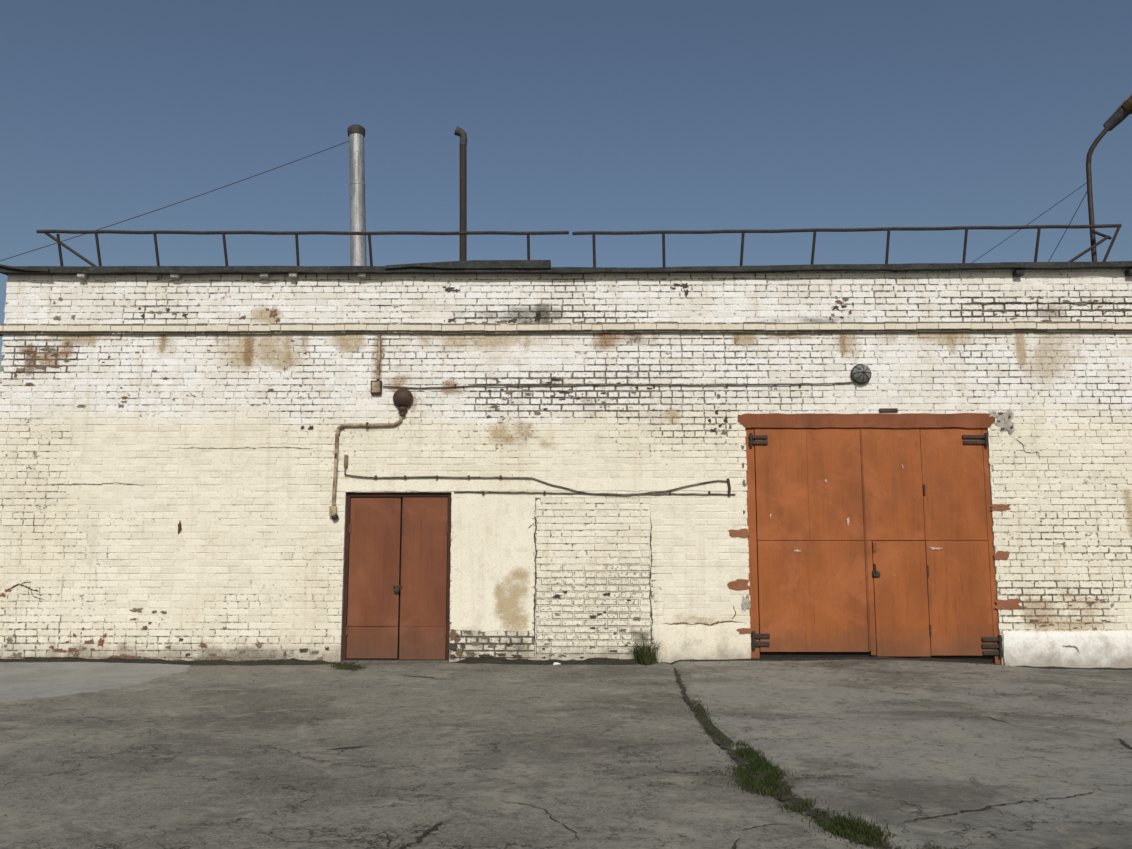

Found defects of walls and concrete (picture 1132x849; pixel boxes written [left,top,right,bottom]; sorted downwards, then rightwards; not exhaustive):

damp [233,310,292,367]
damp [1016,333,1026,364]
damp [496,570,527,631]
crack [673,667,1095,849]
crack [386,820,450,849]